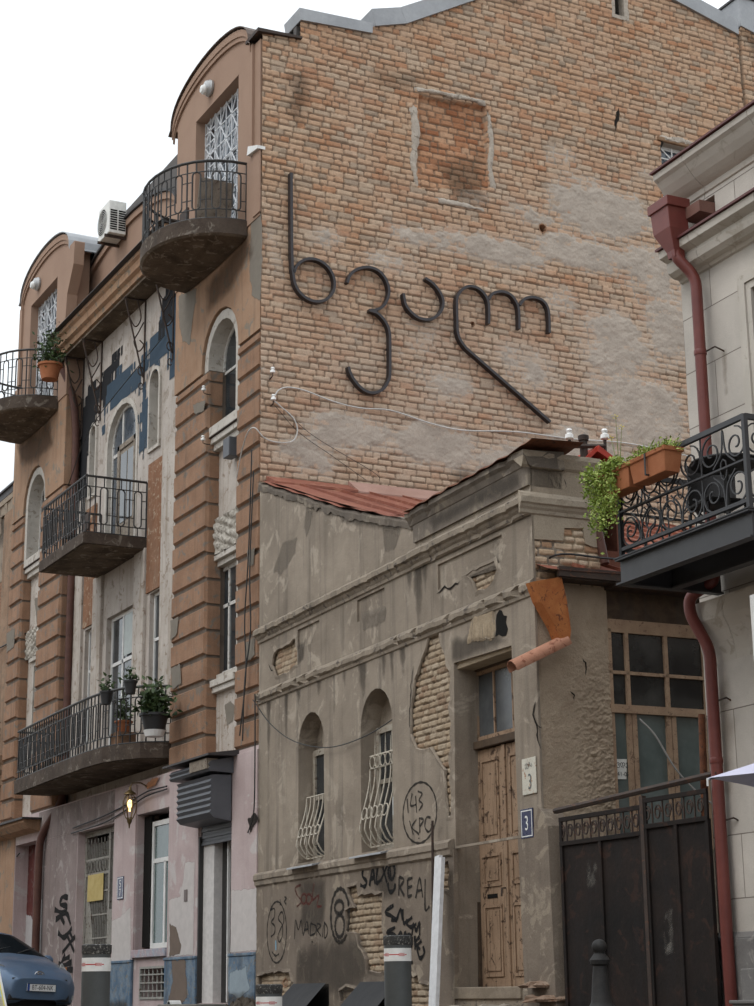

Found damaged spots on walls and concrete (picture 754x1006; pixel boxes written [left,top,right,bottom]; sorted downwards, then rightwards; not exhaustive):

flaking render [467,610,508,644]
flaking render [271,635,299,680]
flaking render [409,633,453,821]
peeling [230,888,257,952]
flaking render [337,881,387,1006]
flaking render [229,966,294,998]
flaking render [411,970,429,1006]